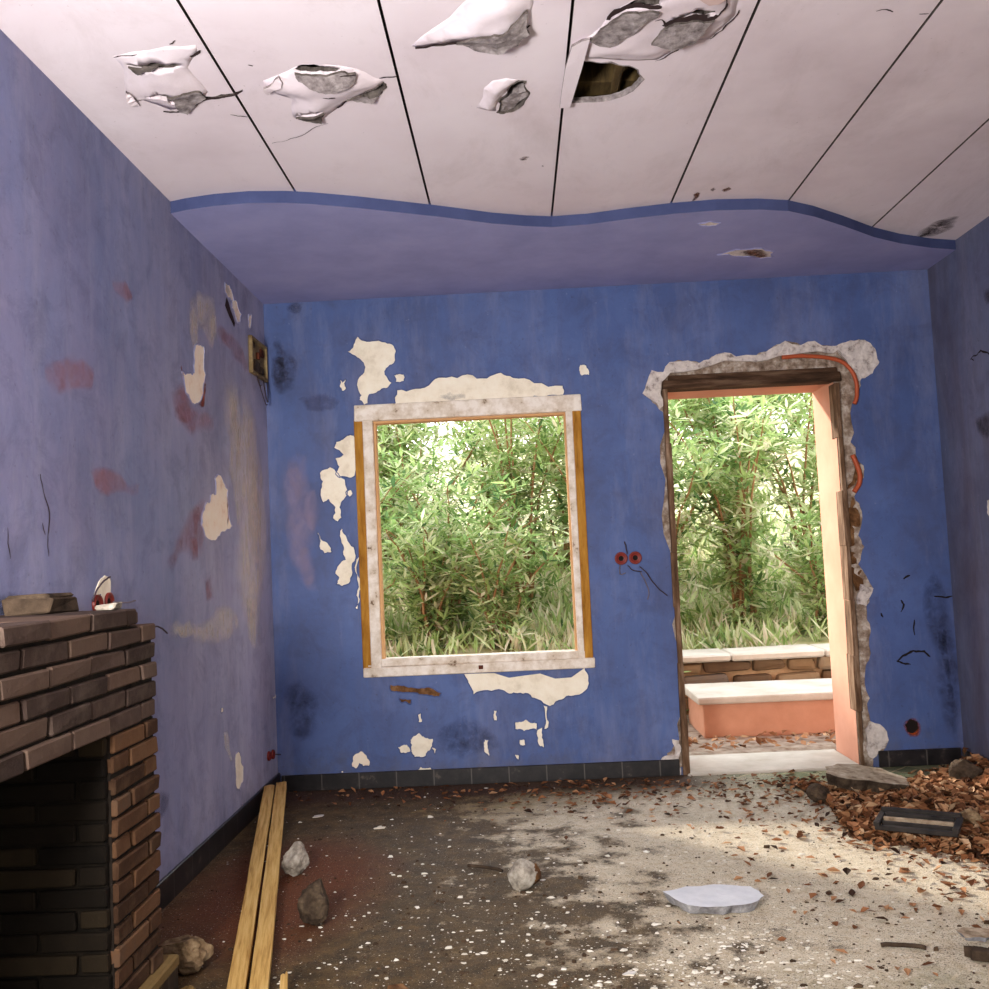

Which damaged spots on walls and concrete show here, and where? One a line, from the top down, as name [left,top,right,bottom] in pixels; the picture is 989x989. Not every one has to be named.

peeling [181,343,206,406]
peeling [339,336,565,405]
peeling [201,473,232,542]
peeling [316,434,361,610]
flaking render [643,340,889,766]
peeling [464,668,590,761]
flaking render [661,718,682,775]